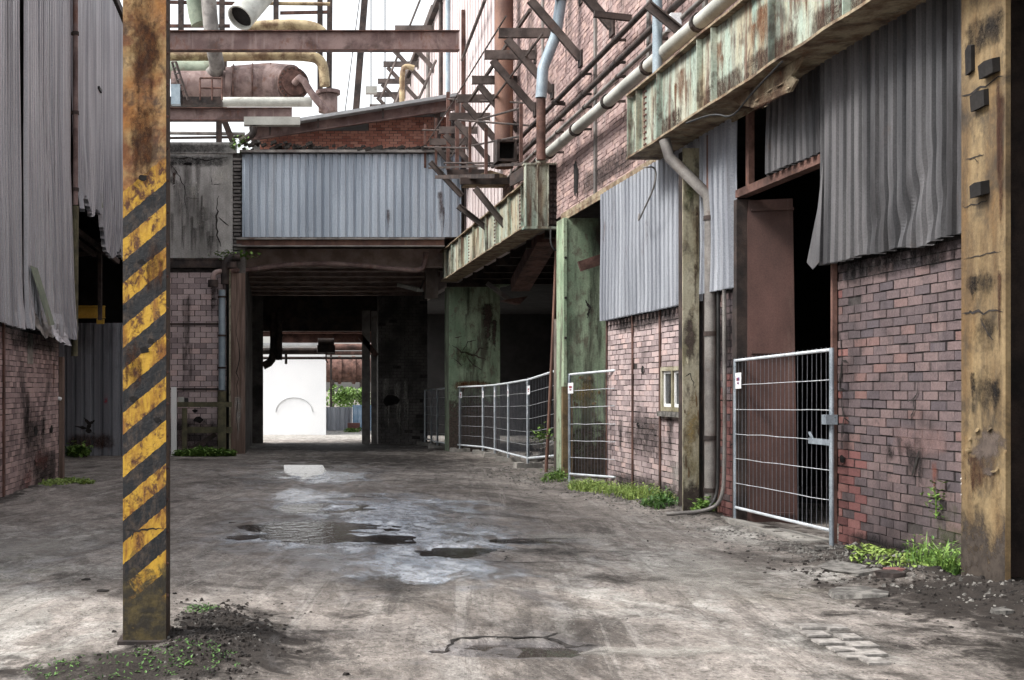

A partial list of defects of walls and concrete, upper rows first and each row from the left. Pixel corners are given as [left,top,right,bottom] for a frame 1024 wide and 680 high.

rust [133,4,159,93]
rust [704,3,796,106]
rust [790,0,866,33]
rust [653,70,687,134]
rust [132,107,151,170]
crack [171,157,229,246]
crack [452,336,487,370]
water stain [482,304,497,348]